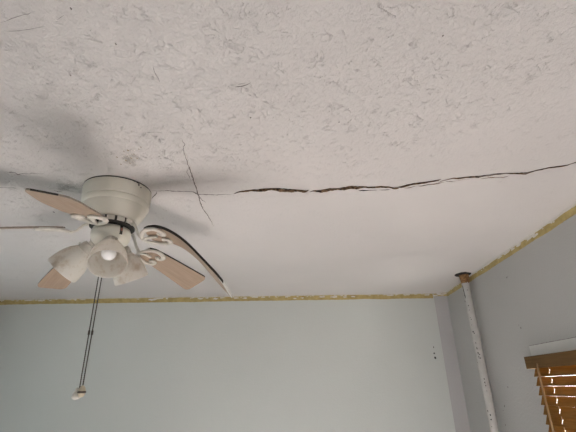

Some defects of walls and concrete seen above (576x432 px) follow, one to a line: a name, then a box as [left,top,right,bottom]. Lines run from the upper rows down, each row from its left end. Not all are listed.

crack [151,140,576,226]
peeling [469,203,576,282]
peeling [0,282,466,305]